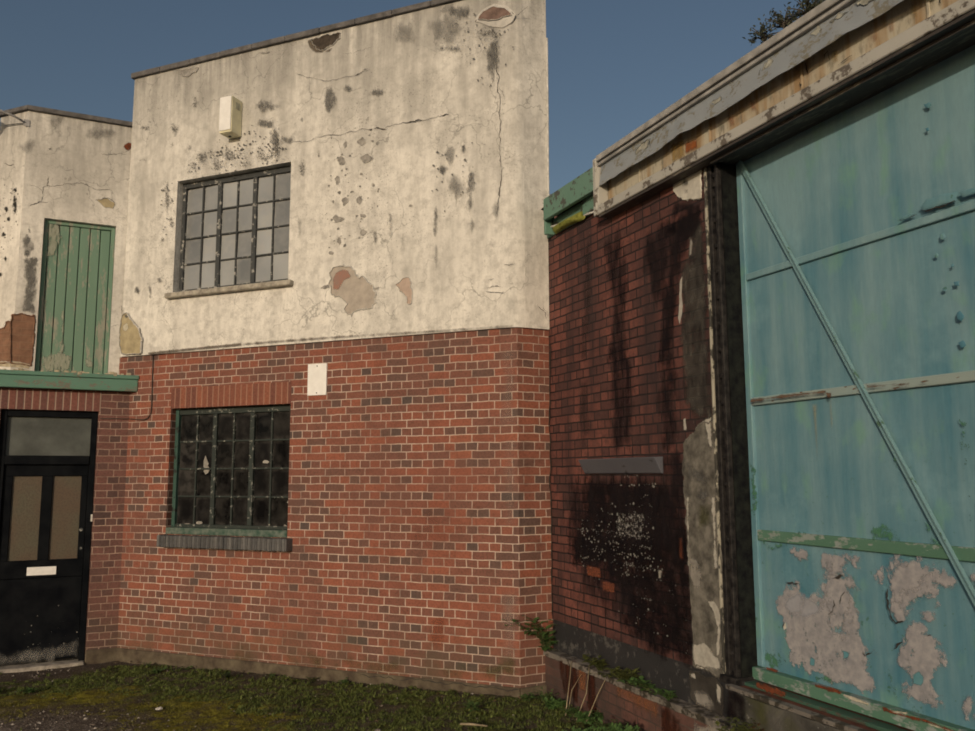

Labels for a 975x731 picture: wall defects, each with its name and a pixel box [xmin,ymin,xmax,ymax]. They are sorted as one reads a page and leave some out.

peeling [325,129,380,255]
crack [495,40,503,211]
spalling [673,170,702,201]
spalling [0,307,72,372]
spalling [119,306,143,355]
peeling [321,264,379,317]
damp [606,241,631,447]
damp [645,204,700,447]
spalling [678,222,724,717]
damp [578,475,663,624]
peeling [765,553,876,694]
peeling [874,554,956,712]